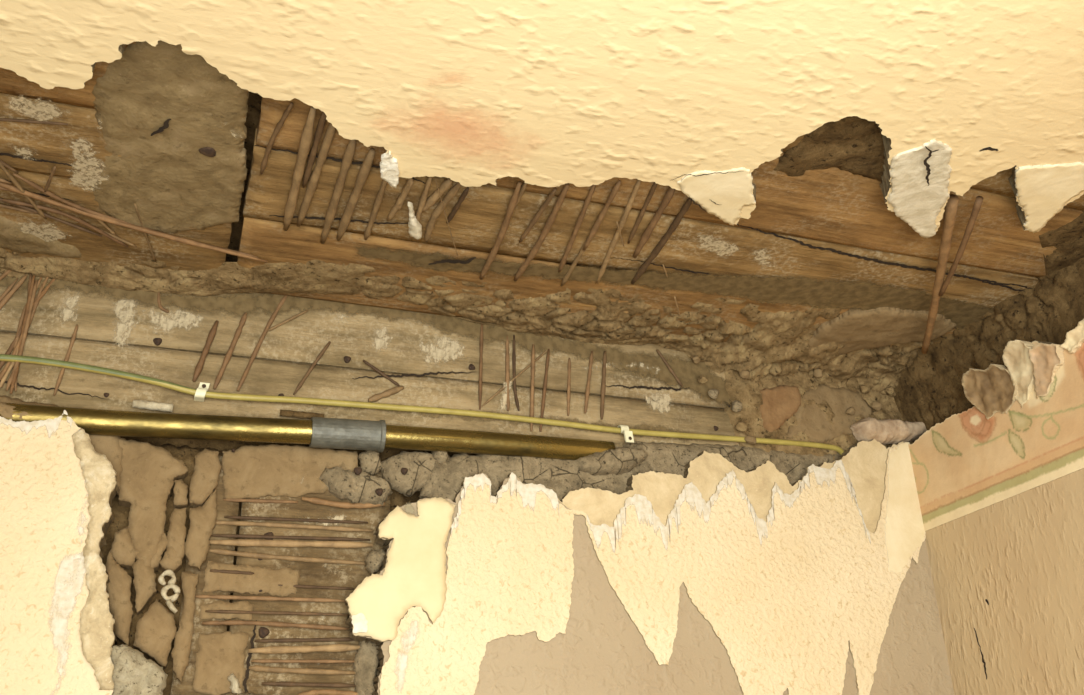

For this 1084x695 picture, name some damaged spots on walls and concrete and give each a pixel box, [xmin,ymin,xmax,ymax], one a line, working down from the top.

peeling [380,151,399,188]
peeling [677,167,756,226]
peeling [887,139,952,238]
crack [924,146,938,186]
peeling [1015,162,1084,233]
peeling [961,319,1084,419]
peeling [0,410,117,695]
peeling [345,439,926,695]